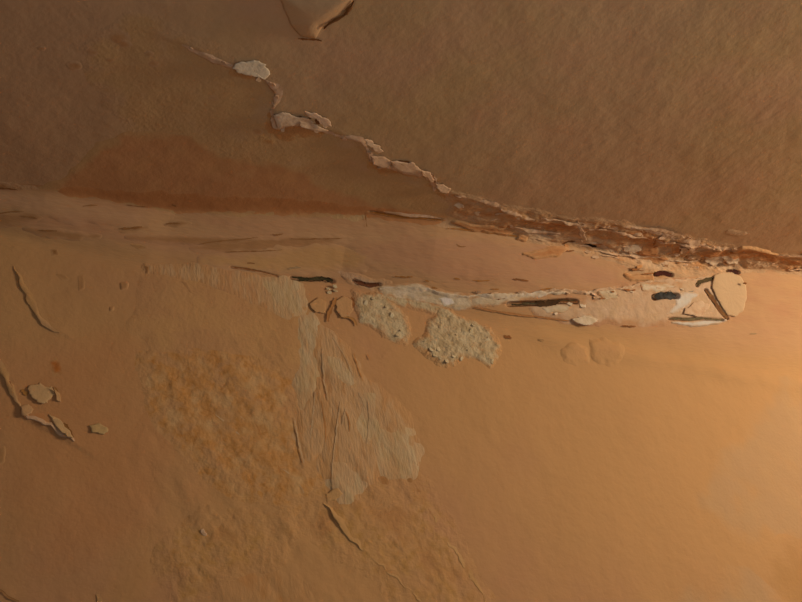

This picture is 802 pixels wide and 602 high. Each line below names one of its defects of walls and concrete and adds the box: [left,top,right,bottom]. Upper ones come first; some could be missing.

leakage [0,307,226,579]
leakage [0,131,625,504]
spalling [182,44,802,369]